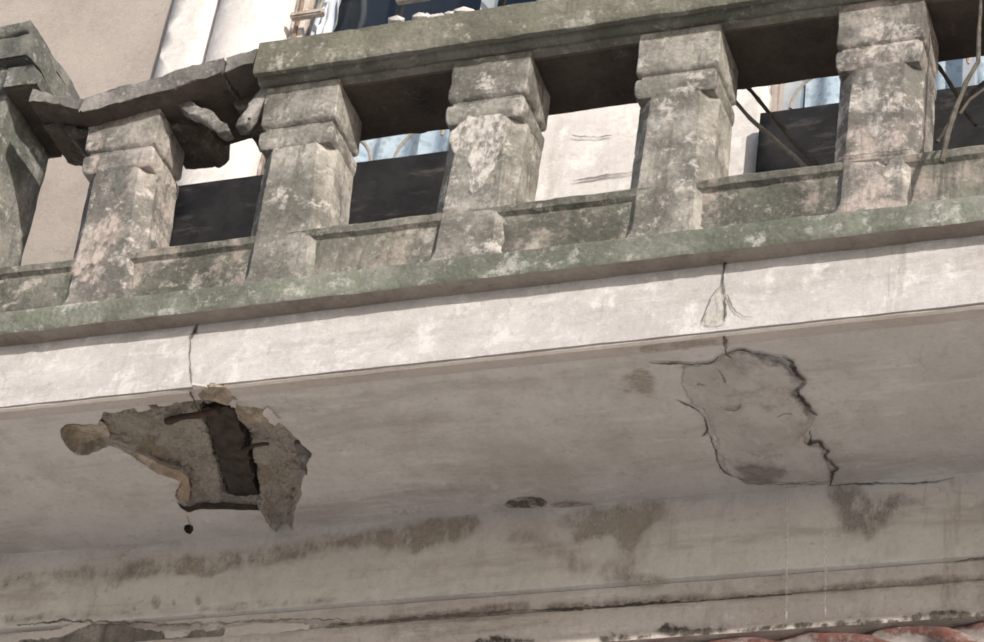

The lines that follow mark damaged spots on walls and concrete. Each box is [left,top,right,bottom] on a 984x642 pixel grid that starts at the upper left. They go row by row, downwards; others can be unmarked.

crack [189,325,200,413]
crack [648,263,952,487]
spalling [60,383,312,532]
peeling [506,497,581,508]
damp [833,487,899,533]
damp [327,517,475,550]
peeling [0,618,351,642]